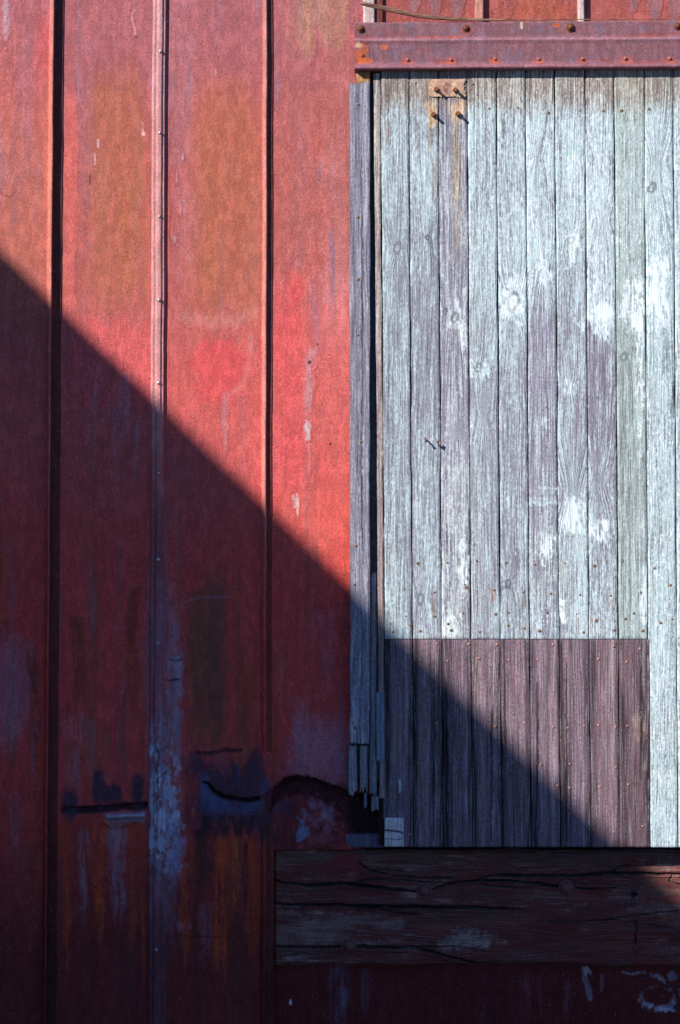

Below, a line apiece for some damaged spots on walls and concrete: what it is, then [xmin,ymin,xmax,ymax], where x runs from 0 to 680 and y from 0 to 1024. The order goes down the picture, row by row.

corrosion [354,41,389,66]
corrosion [487,56,503,67]
corrosion [529,56,550,67]
corrosion [618,54,635,65]
peeling [148,599,275,893]
peeling [291,792,352,849]
crack [274,860,680,954]
crack [274,944,483,963]